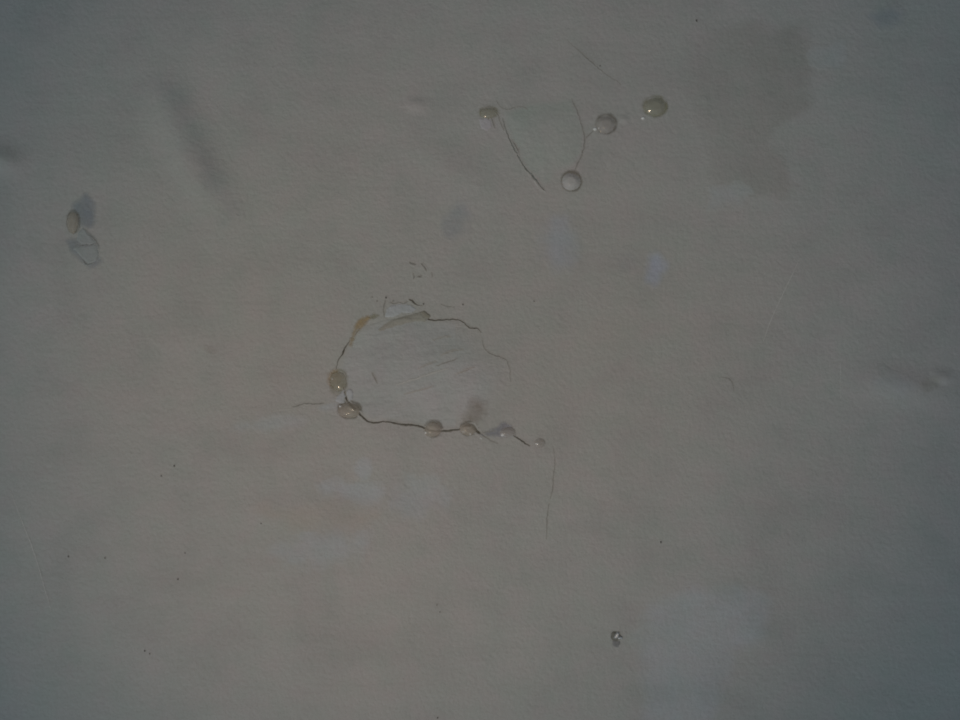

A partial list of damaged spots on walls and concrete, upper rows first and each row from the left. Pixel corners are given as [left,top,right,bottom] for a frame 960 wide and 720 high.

crack [502,119,546,194]
crack [371,295,511,382]
crack [272,328,530,446]